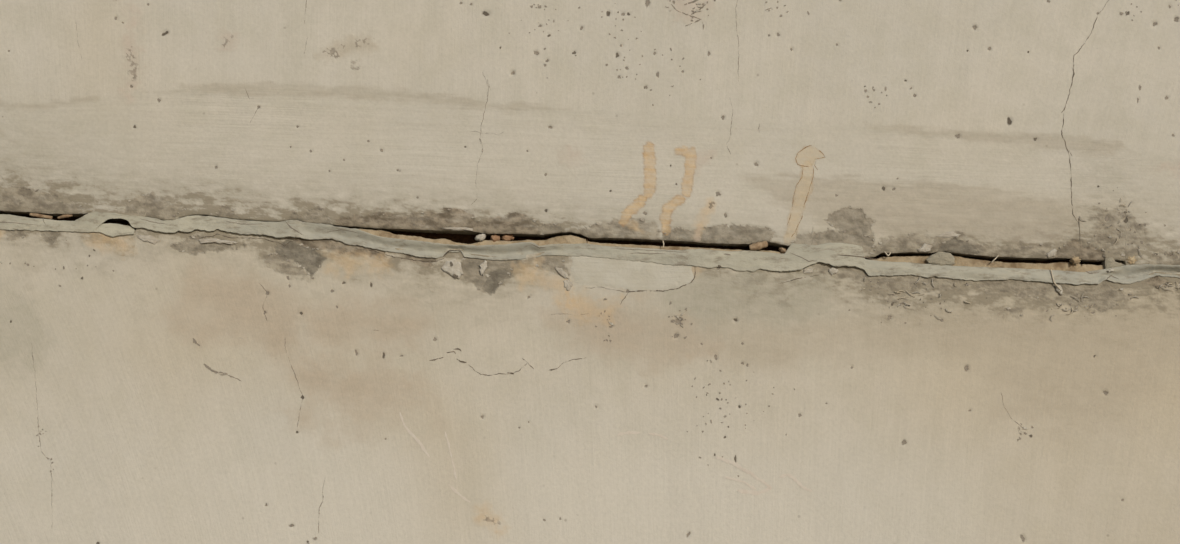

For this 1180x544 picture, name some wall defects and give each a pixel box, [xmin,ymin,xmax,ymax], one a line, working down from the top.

crack [963,0,1109,265]
spalling [5,230,67,247]
crack [0,213,136,229]
spalling [120,189,189,220]
spalling [137,234,518,296]
spalling [285,197,777,244]
spalling [536,255,573,291]
crack [360,231,787,303]
corrosion [618,140,721,242]
corrosion [782,143,825,246]
crack [873,252,931,260]
leakage [735,169,1084,248]